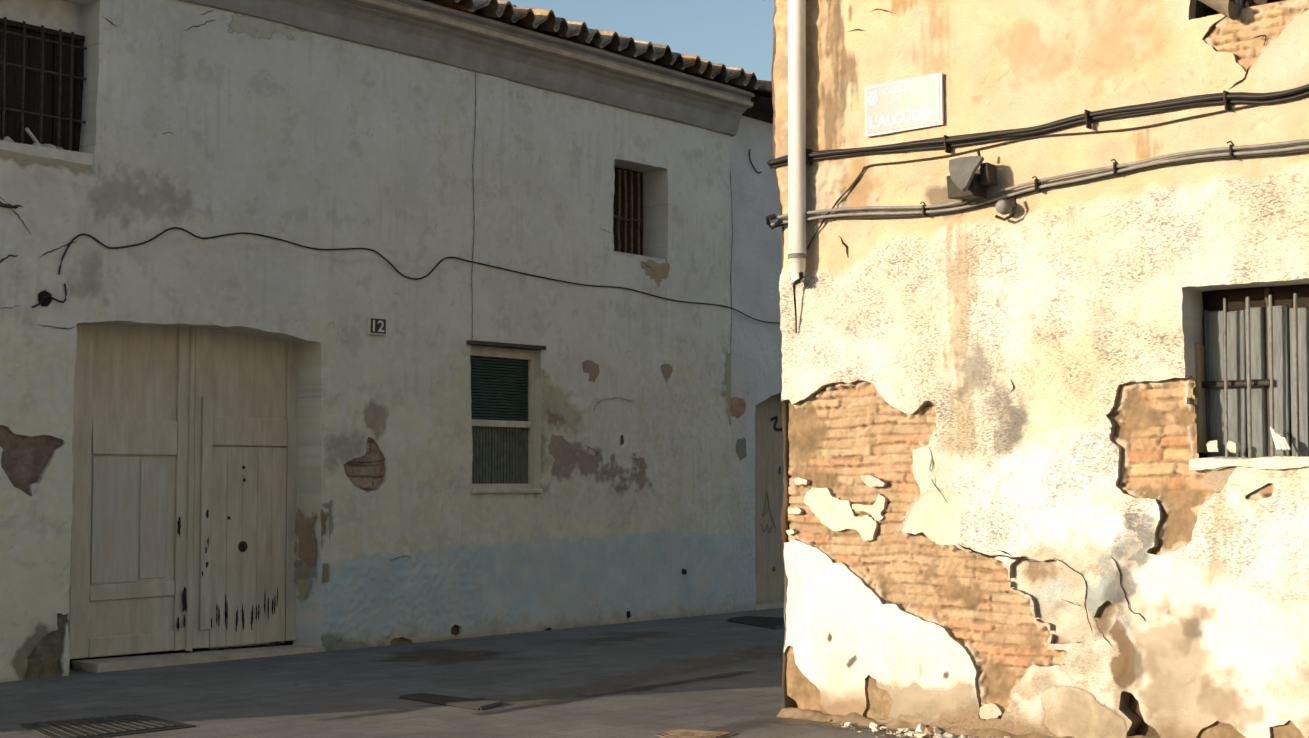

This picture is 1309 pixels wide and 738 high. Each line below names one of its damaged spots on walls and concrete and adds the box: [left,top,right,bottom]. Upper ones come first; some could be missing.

flaking render [1203,0,1309,71]
flaking render [729,397,746,418]
flaking render [0,426,63,496]
flaking render [343,437,385,492]
flaking render [1110,375,1237,555]
flaking render [1247,483,1275,500]
peeling [294,508,330,600]
flaking render [786,380,1118,720]
flaking render [24,613,69,679]
spalling [1129,693,1160,737]
flaking render [1198,721,1247,738]
flaking render [1271,720,1304,738]